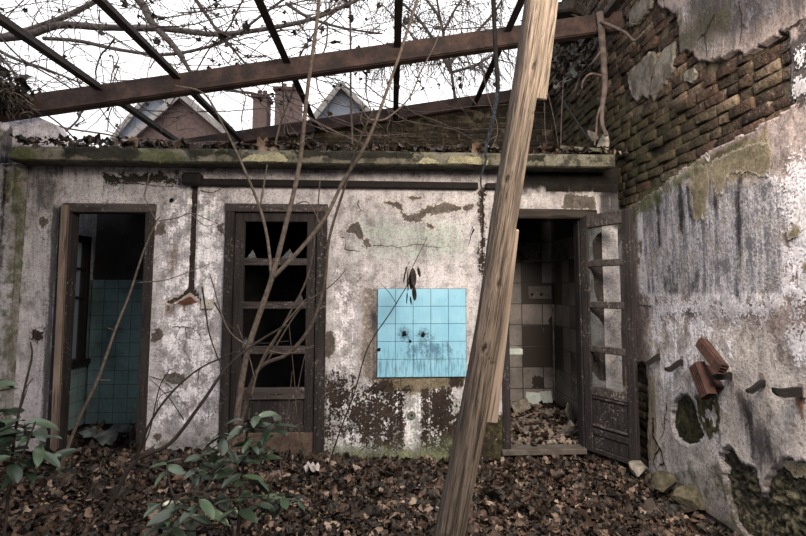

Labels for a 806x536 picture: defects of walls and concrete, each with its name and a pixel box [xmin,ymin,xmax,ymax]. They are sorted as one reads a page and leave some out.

peeling [343,221,373,250]
peeling [383,195,476,231]
flaking render [546,0,806,366]
water stain [678,183,693,233]
spalling [689,337,729,400]
spalling [724,448,806,536]